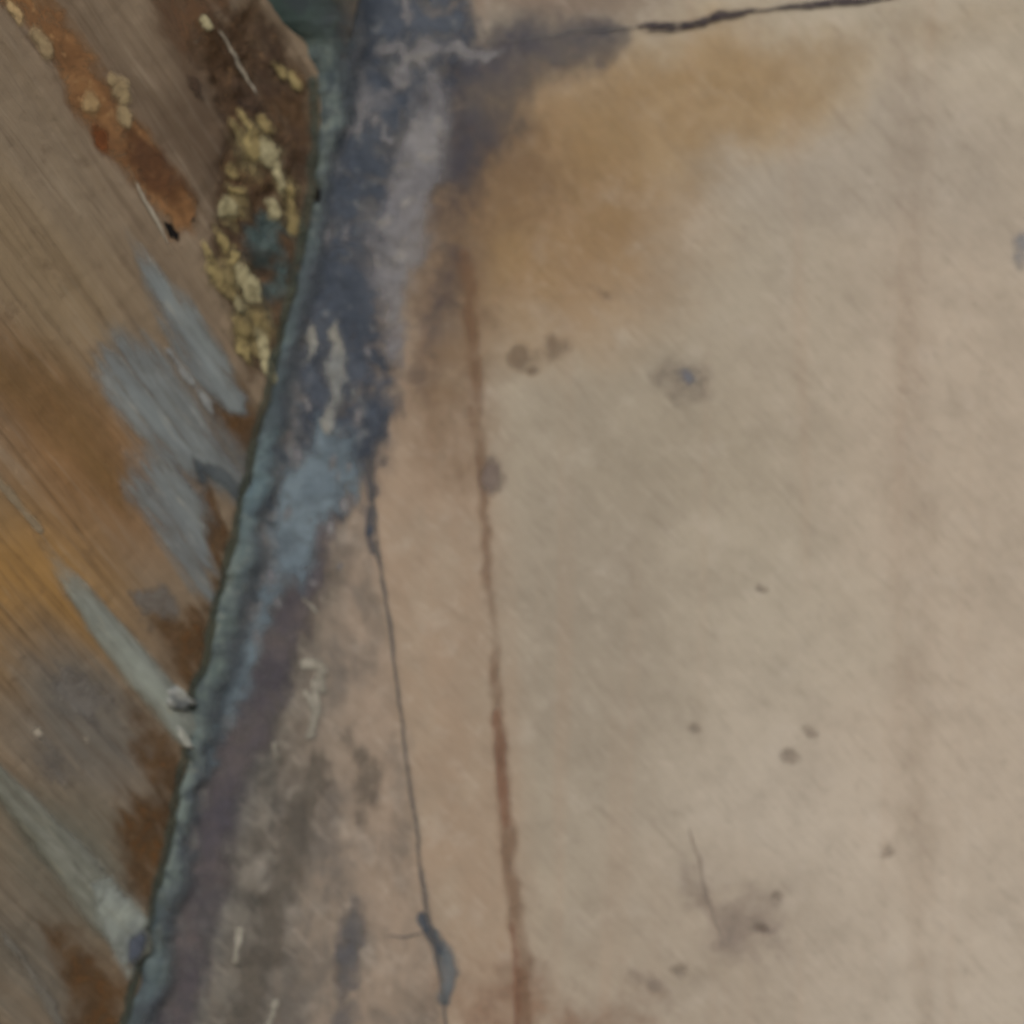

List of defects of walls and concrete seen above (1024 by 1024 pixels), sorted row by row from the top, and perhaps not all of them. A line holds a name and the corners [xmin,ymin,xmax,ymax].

corrosion [92,126,108,151]
crack [485,0,878,43]
damp [157,0,616,1024]
crack [367,458,447,1024]